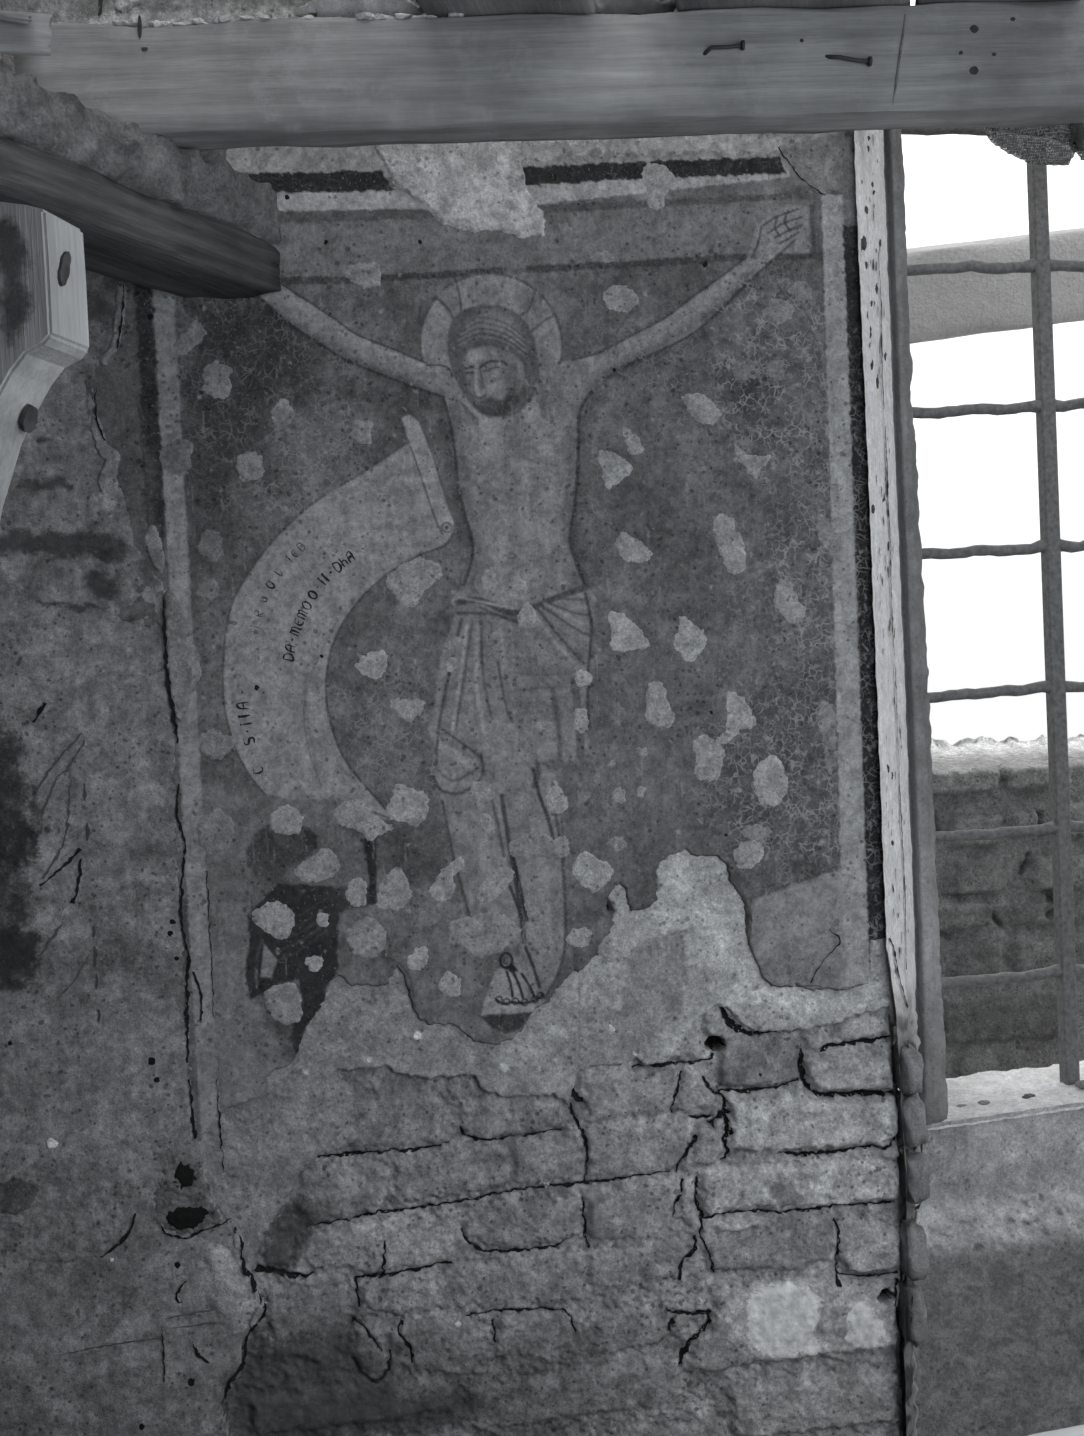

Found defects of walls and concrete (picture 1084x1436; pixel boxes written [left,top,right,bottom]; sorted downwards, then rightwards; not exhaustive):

flaking render [597,427,644,489]
flaking render [712,514,746,574]
flaking render [608,611,650,652]
flaking render [673,616,707,662]
flaking render [692,691,756,782]
flaking render [753,755,788,807]
flaking render [333,784,429,841]
crack [306,252,923,1383]
water stain [0,721,42,990]
crack [175,784,224,1173]
flaking render [153,824,931,1436]
crack [254,1264,314,1279]